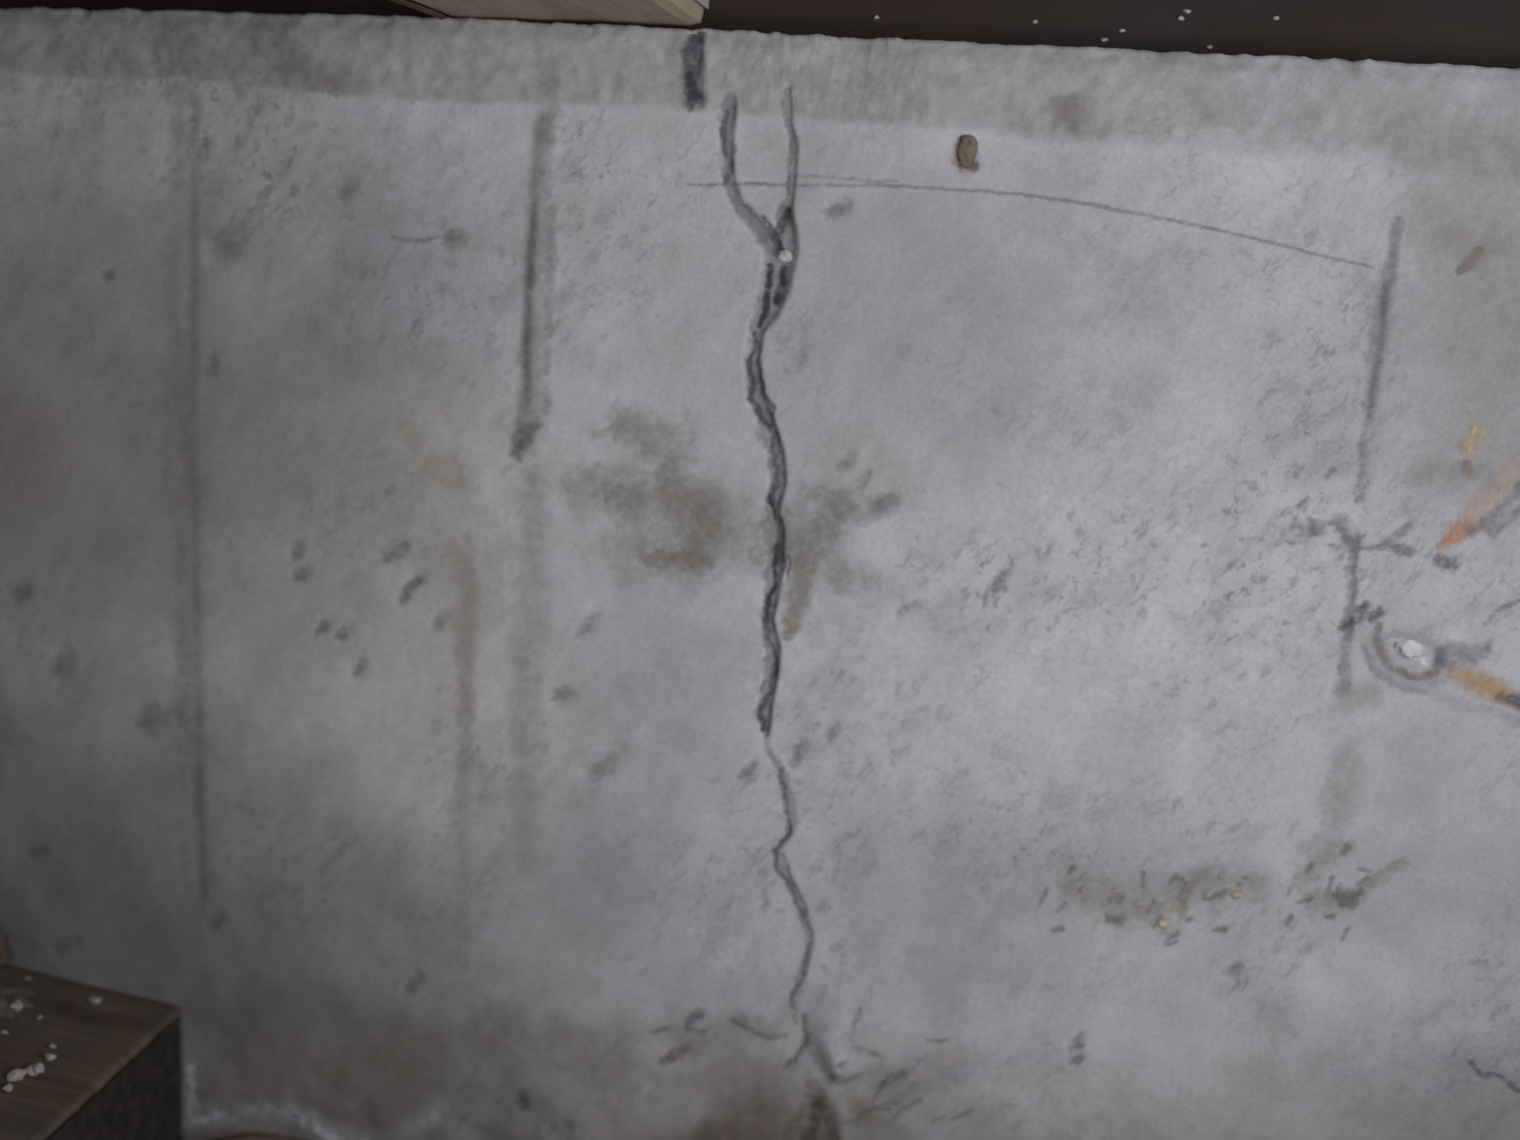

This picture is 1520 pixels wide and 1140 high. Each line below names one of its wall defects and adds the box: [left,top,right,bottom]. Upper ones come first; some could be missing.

crack [850,177,1369,267]
leakage [624,469,822,640]
crack [687,88,813,1068]
crack [1300,522,1412,556]
rust [1451,671,1514,706]
crack [1470,1061,1520,1093]